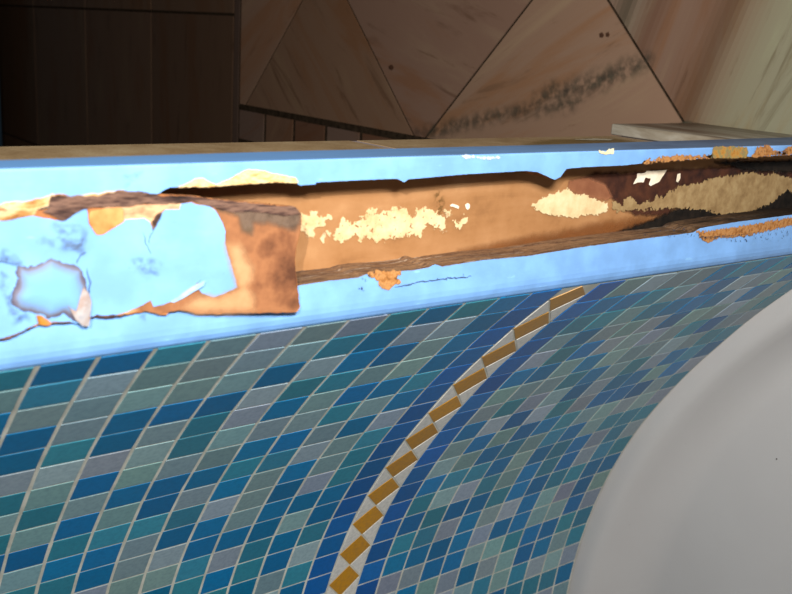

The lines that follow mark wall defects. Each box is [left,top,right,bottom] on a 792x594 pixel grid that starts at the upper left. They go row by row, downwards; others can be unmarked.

peeling [644,145,792,165]
peeling [89,203,181,235]
peeling [443,203,470,230]
peeling [696,217,792,243]
peeling [118,203,301,315]
peeling [367,269,401,290]
crack [90,312,127,320]
crack [0,321,72,340]